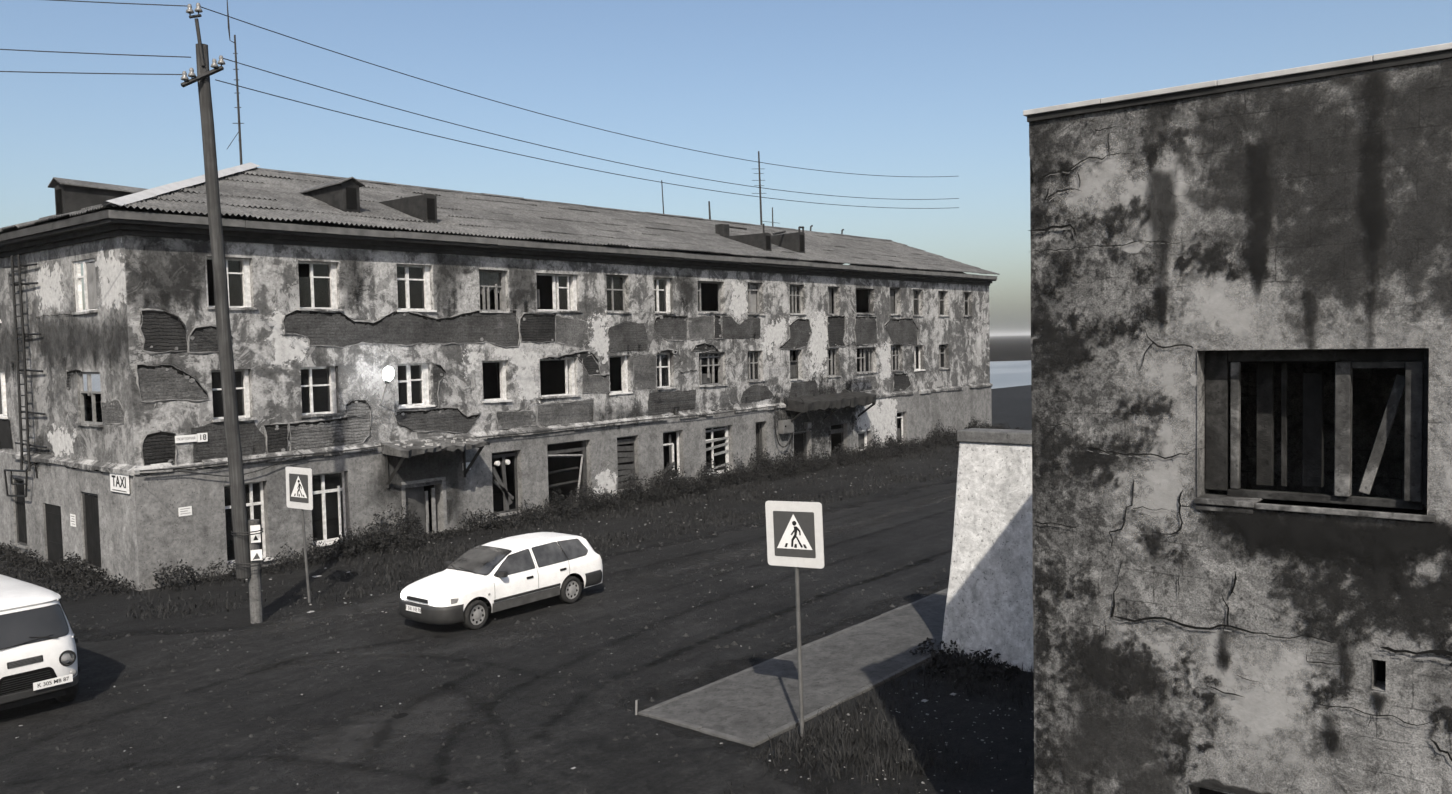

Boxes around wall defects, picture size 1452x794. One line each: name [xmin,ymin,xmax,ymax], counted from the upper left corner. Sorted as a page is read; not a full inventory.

damp [1032,60,1452,381]
spalling [93,237,233,404]
spalling [140,276,918,468]
crack [1207,675,1259,699]
damp [1190,505,1452,751]
crack [1315,703,1452,761]